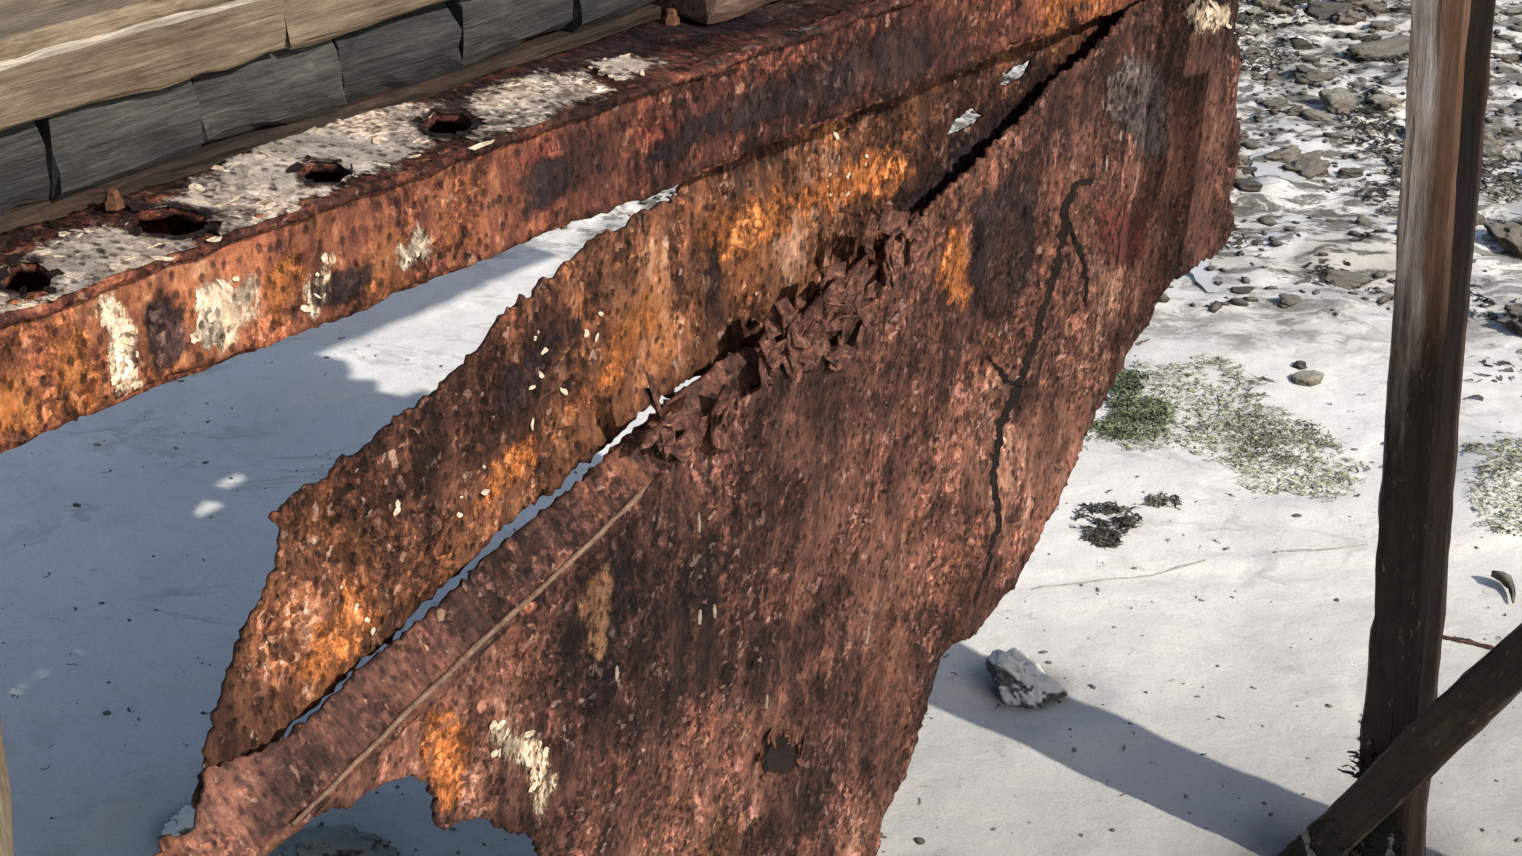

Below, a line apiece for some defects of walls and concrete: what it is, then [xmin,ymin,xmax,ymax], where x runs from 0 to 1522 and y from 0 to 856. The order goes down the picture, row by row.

rust [395,0,833,126]
rust [695,55,1078,389]
rust [0,372,38,435]
rust [132,289,187,374]
rust [266,249,375,322]
rust [494,304,590,418]
rust [578,279,738,464]
crack [973,177,1122,602]
rust [474,434,536,513]
rust [299,577,384,679]
rust [579,565,615,661]
rust [421,708,475,813]